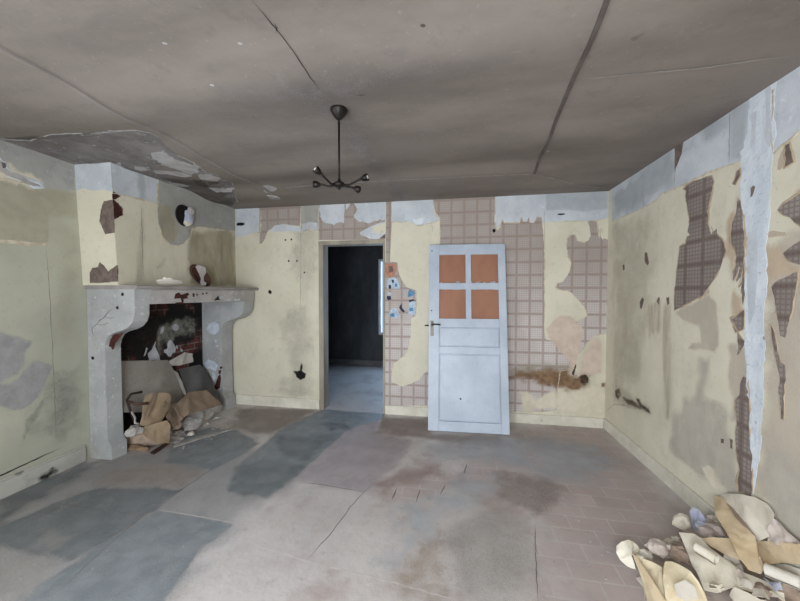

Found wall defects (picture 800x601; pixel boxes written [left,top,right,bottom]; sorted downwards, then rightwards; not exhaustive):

crack [252,0,318,87]
peeling [0,130,440,246]
spalling [90,262,119,283]
spalling [492,66,800,495]
water stain [0,332,86,444]
water stain [0,407,506,601]
crack [258,482,459,601]